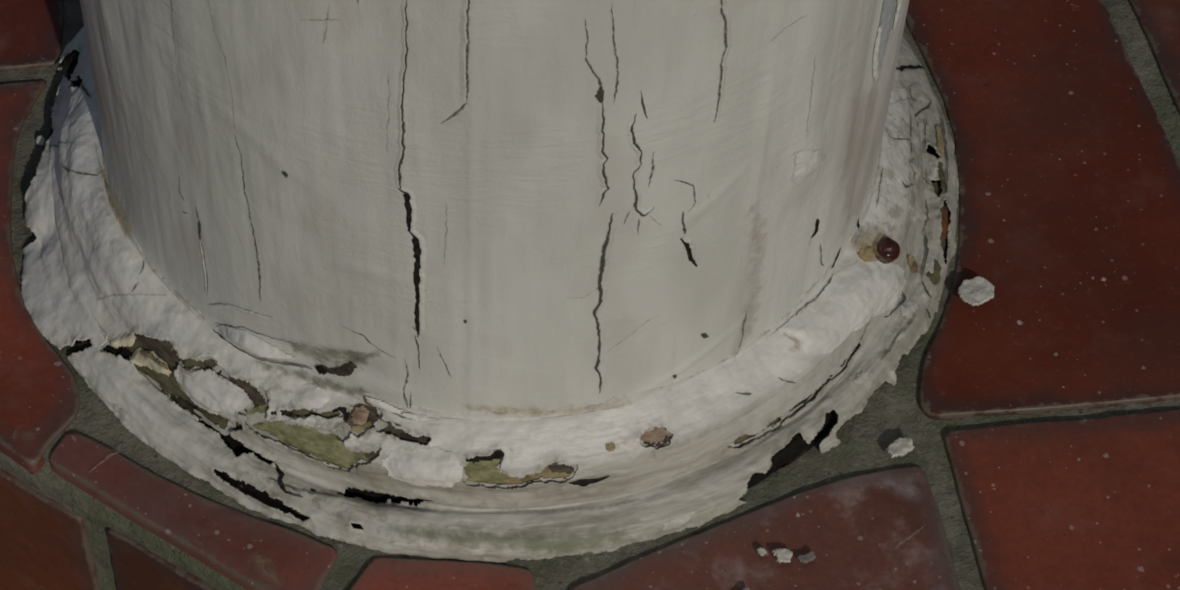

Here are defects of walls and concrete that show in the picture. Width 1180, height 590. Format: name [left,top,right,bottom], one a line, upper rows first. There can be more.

crack [179,136,297,345]
crack [344,0,451,408]
crack [585,5,701,393]
peeling [881,80,949,363]
peeling [66,333,431,471]
spalling [219,471,297,511]
spalling [339,488,424,506]
peeling [462,449,610,488]
peeling [662,512,695,531]
spalling [747,411,848,489]
peeling [728,343,868,448]